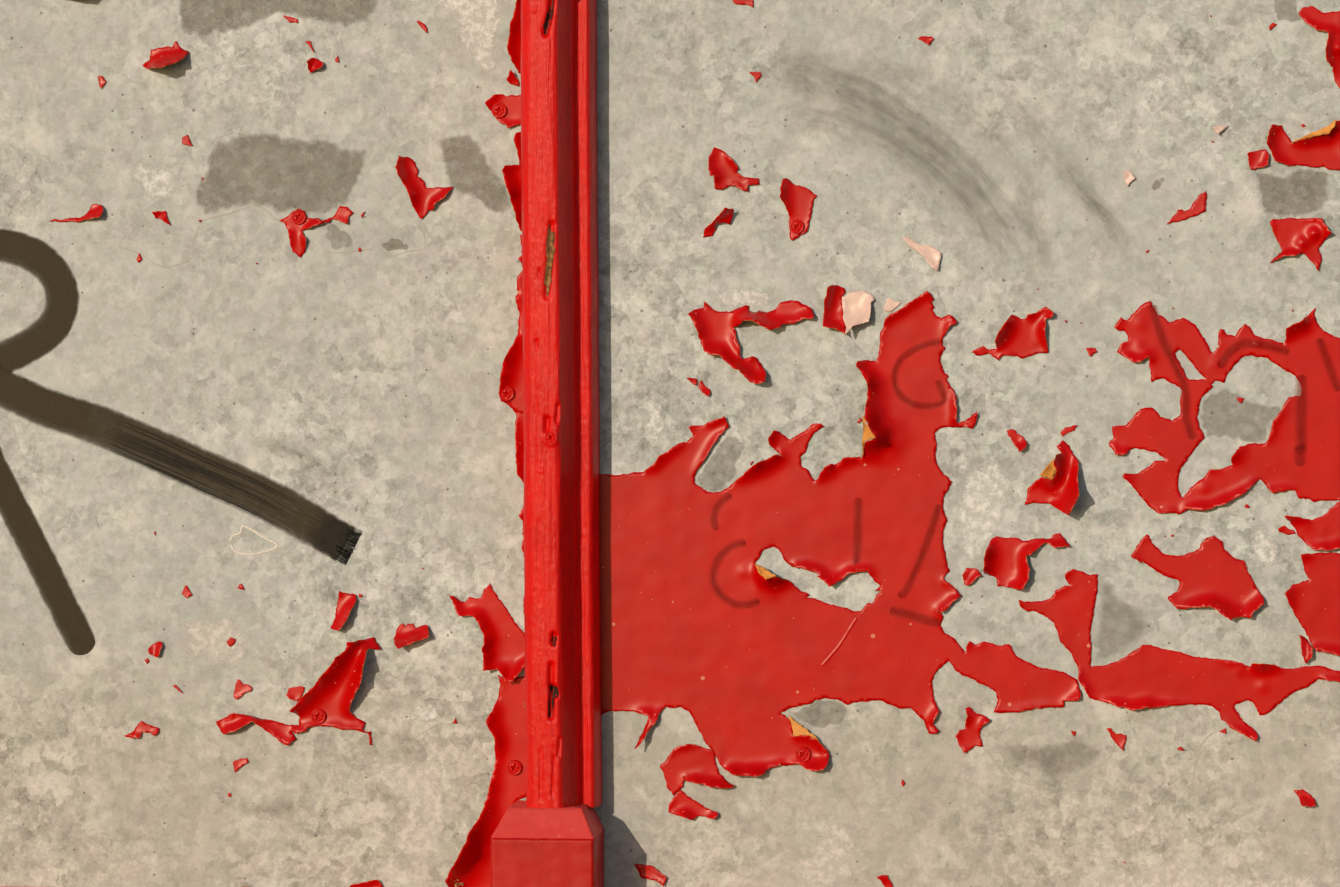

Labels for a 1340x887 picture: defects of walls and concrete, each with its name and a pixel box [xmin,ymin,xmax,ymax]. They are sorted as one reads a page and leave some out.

peeling [1298,6,1340,88]
peeling [280,206,365,258]
peeling [395,155,453,219]
peeling [485,0,524,483]
peeling [703,207,734,237]
peeling [708,147,760,192]
peeling [779,178,817,241]
peeling [1247,120,1340,170]
peeling [1270,218,1332,271]
peeling [600,285,1340,820]
peeling [215,591,429,745]
peeling [445,584,526,887]